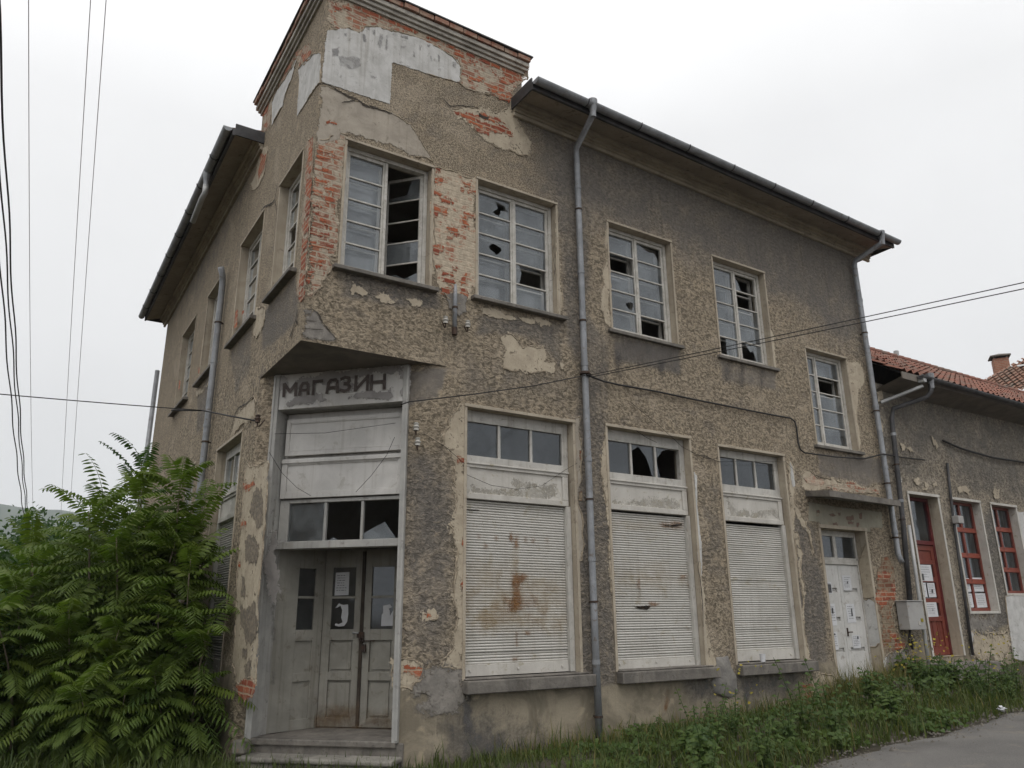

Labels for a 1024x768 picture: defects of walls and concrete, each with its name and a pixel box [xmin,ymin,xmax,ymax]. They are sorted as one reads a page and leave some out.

peeling [262,0,565,375]